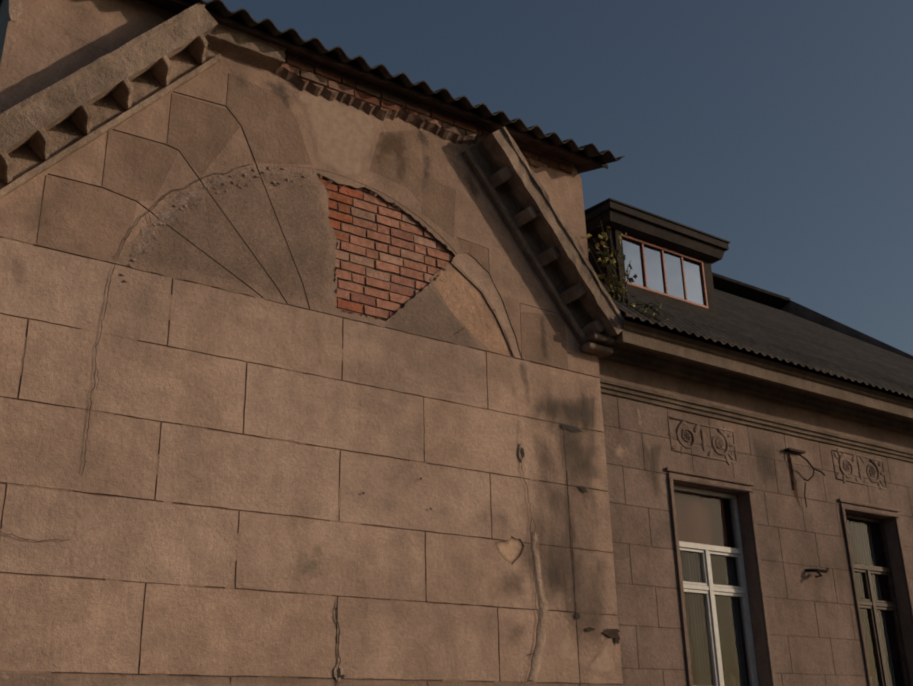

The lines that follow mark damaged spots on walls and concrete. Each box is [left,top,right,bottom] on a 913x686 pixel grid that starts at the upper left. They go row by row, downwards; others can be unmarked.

flaking render [275,52,512,356]
crack [81,164,252,476]
crack [335,599,345,686]
flaking render [497,539,522,561]
crack [521,460,542,680]